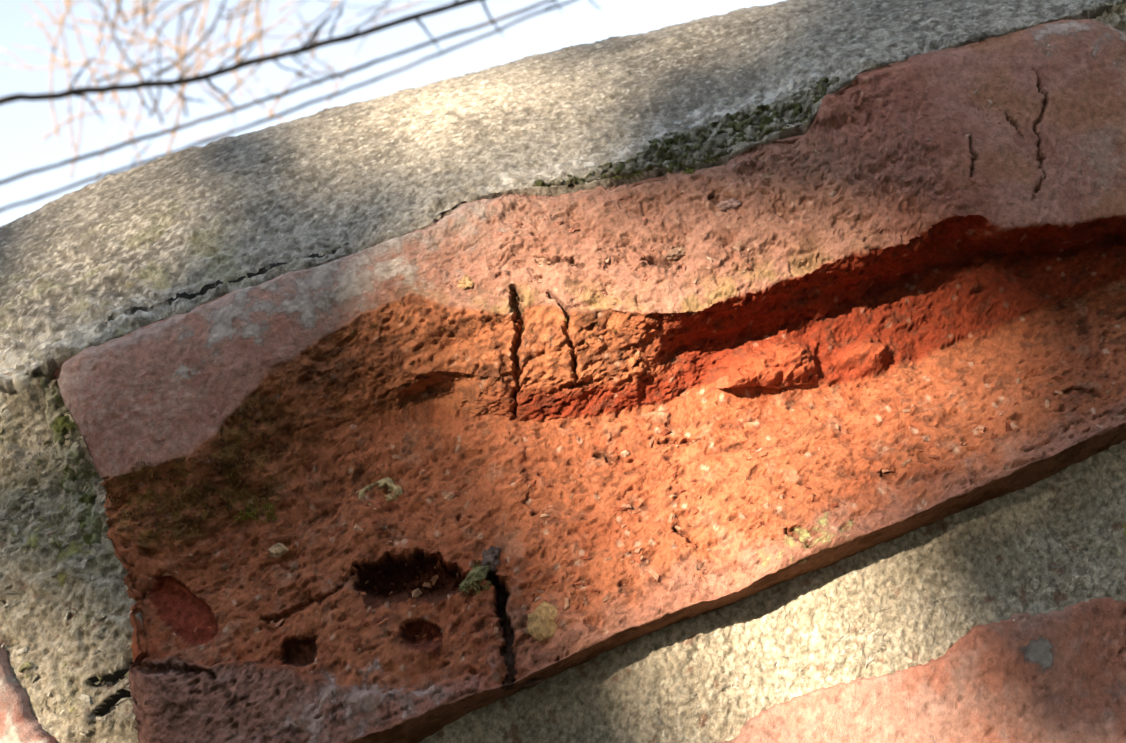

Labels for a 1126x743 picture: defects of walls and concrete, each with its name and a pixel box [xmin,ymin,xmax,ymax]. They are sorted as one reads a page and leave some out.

crack [969,137,980,178]
crack [1033,72,1051,193]
crack [512,286,580,417]
spalling [104,215,1126,699]